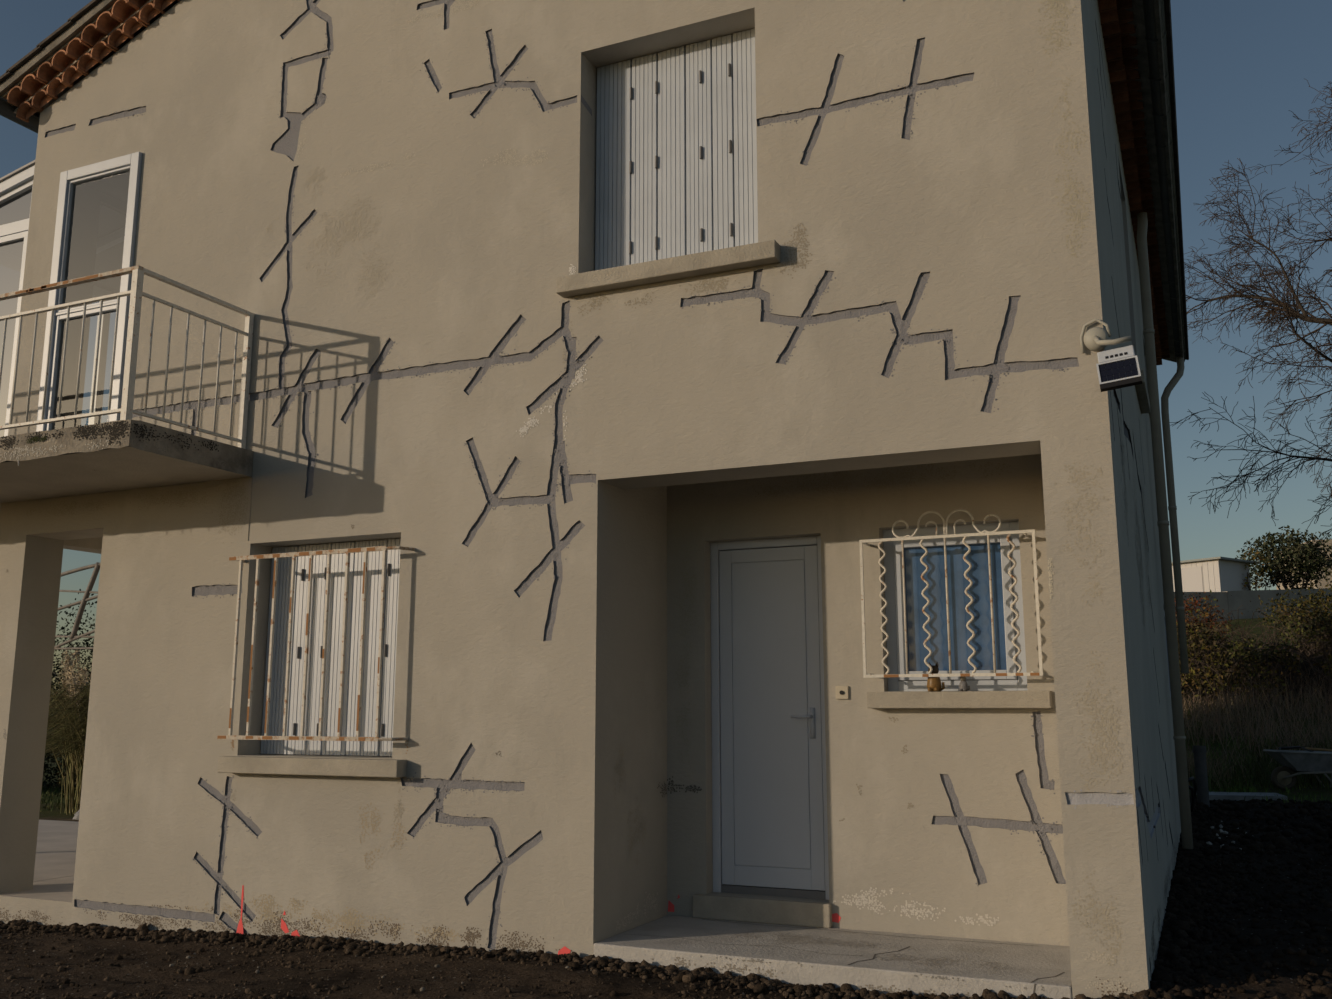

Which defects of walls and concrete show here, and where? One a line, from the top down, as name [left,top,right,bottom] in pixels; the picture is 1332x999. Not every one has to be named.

crack [278,0,334,124]
crack [420,29,592,119]
crack [757,37,974,166]
damp [0,421,219,460]
crack [132,165,604,641]
crack [680,269,1079,413]
corrosion [218,645,272,748]
corrosion [229,554,280,598]
corrosion [337,695,365,741]
crack [931,388,1174,886]
crack [74,775,262,935]
crack [401,743,543,950]